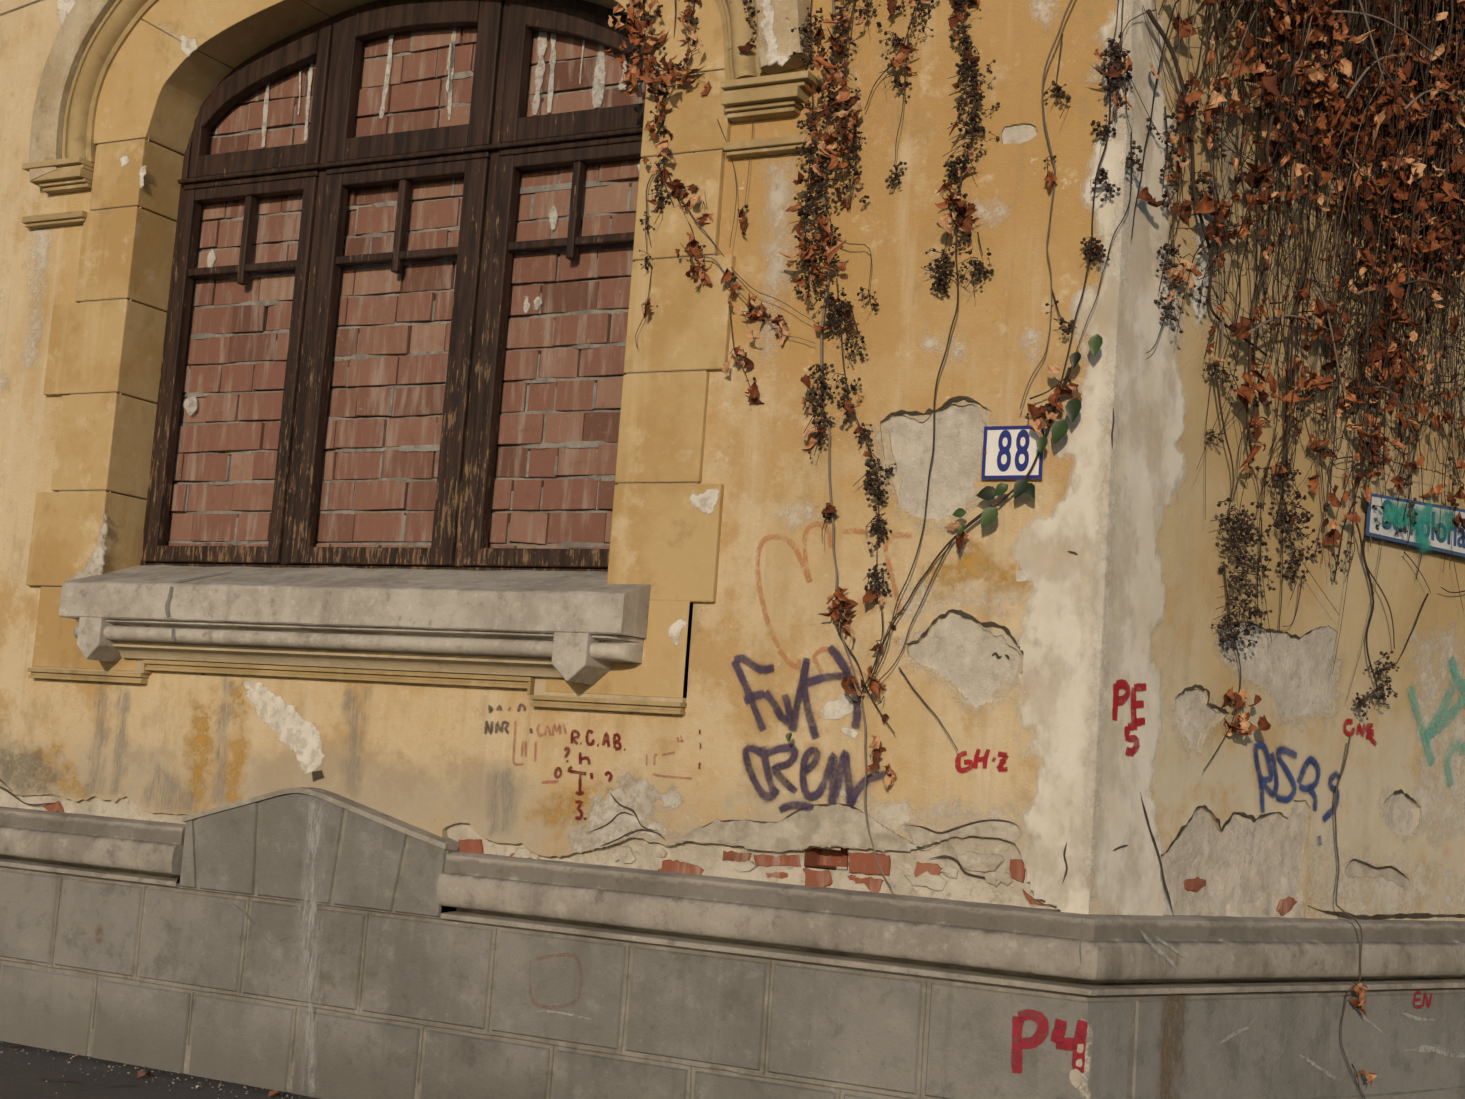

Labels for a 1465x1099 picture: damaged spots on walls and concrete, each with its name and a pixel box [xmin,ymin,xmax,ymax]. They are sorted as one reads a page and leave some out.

flaking render [1002,124,1037,144]
flaking render [875,396,995,528]
water stain [0,750,98,793]
flaking render [0,781,187,824]
peeling [244,681,325,782]
flaking render [447,773,1060,910]
flaking render [899,609,1024,708]
flaking render [1175,684,1230,752]
flaking render [1217,621,1342,724]
flaking render [1160,800,1465,920]
flaking render [1380,789,1420,840]